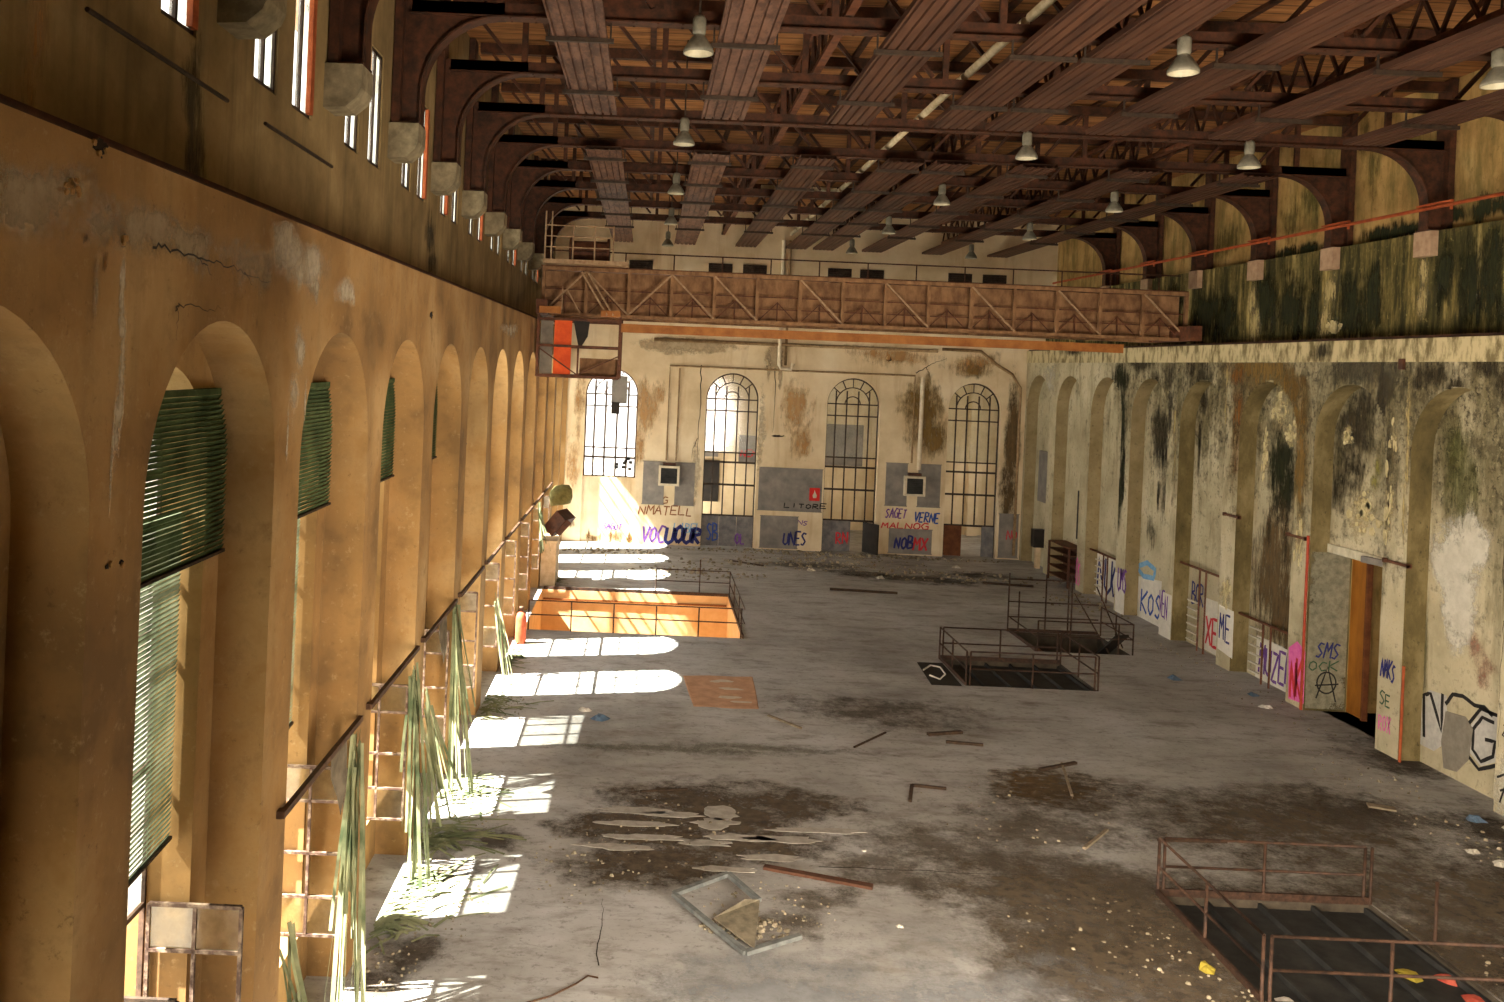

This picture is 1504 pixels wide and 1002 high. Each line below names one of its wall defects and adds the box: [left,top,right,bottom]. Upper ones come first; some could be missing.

damp [1248,290,1276,342]
damp [1417,259,1442,320]
damp [865,350,947,454]
damp [1298,280,1504,540]
damp [1112,362,1309,649]
damp [1305,552,1351,710]
damp [1430,511,1493,686]